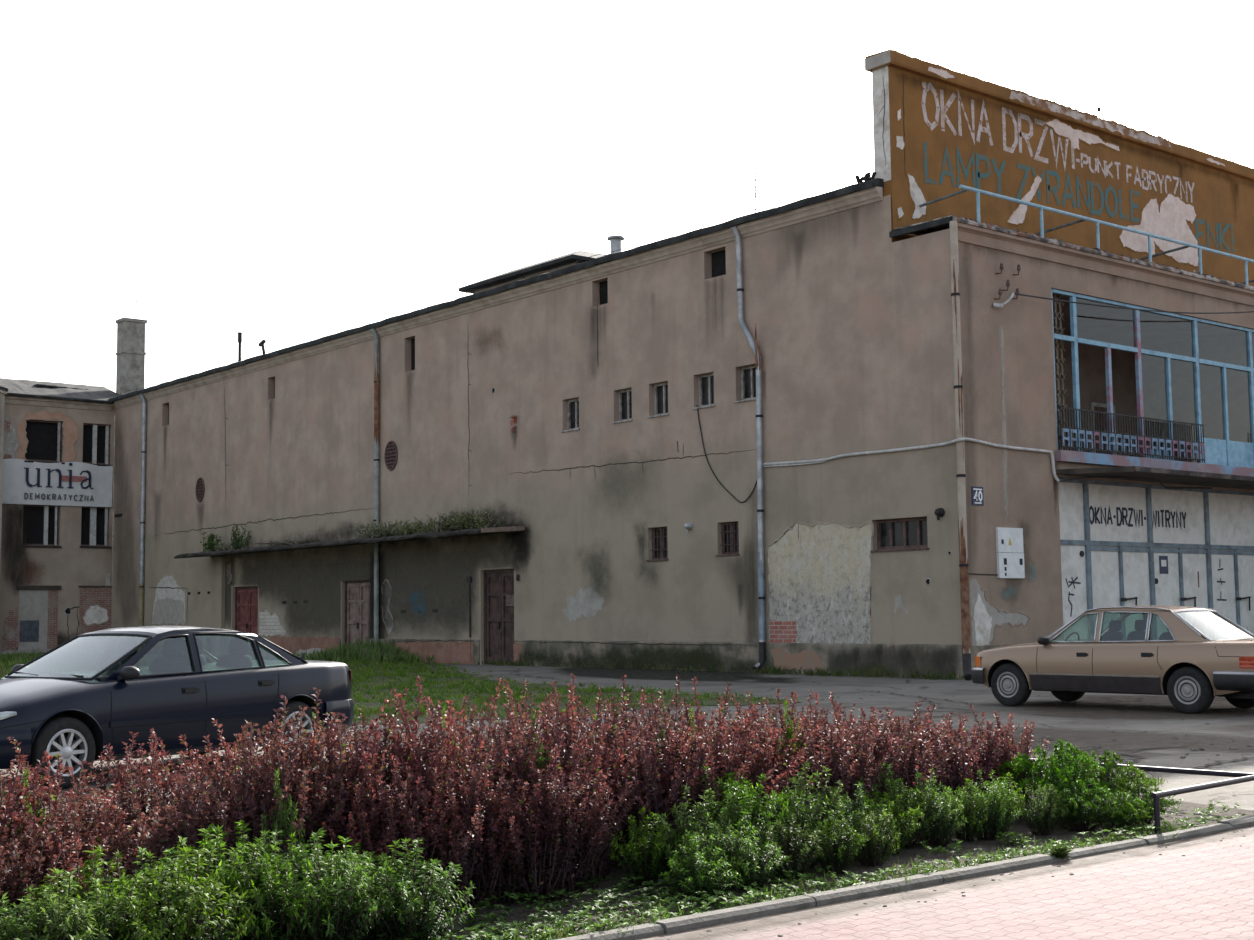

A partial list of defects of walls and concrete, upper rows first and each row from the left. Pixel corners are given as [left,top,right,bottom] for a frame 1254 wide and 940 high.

peeling [1008,89,1172,152]
peeling [896,172,927,222]
peeling [1006,173,1042,227]
peeling [1118,191,1199,269]
flaking render [64,604,110,626]
flaking render [151,574,186,626]
flaking render [766,520,874,671]
flaking render [969,577,1030,646]